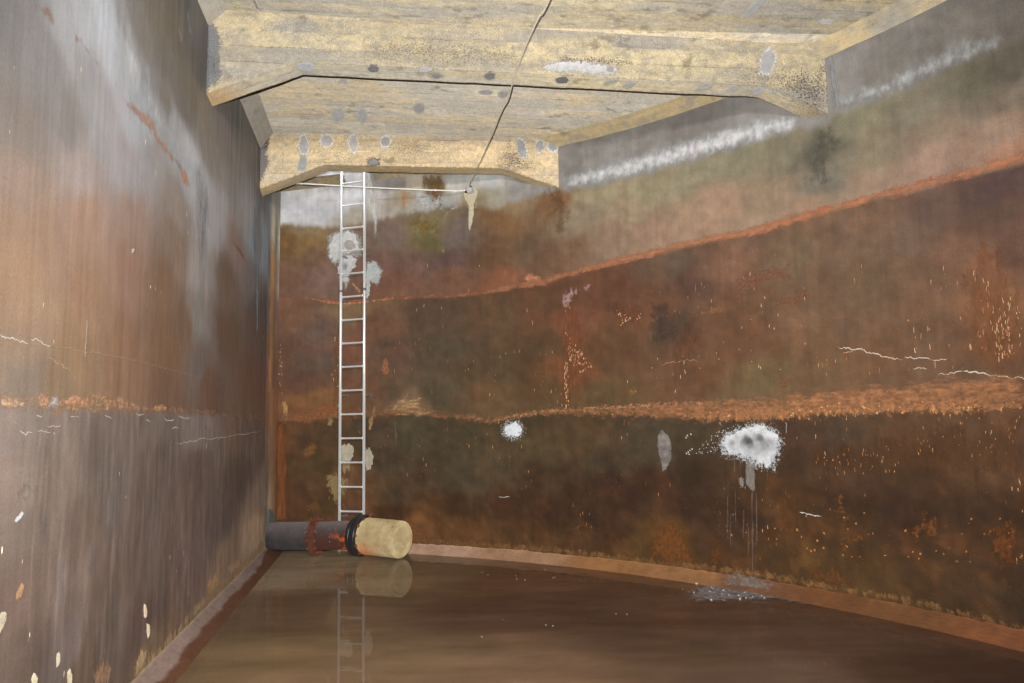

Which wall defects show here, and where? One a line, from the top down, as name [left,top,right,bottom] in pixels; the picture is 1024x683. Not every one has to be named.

damp [770,39,996,116]
rust [132,107,188,183]
damp [567,118,795,186]
damp [414,187,478,230]
rust [306,154,1023,305]
crack [1,335,214,380]
crack [840,347,1024,379]
crack [15,405,112,436]
rust [1,392,261,419]
crack [137,414,254,444]
rust [277,375,1024,520]